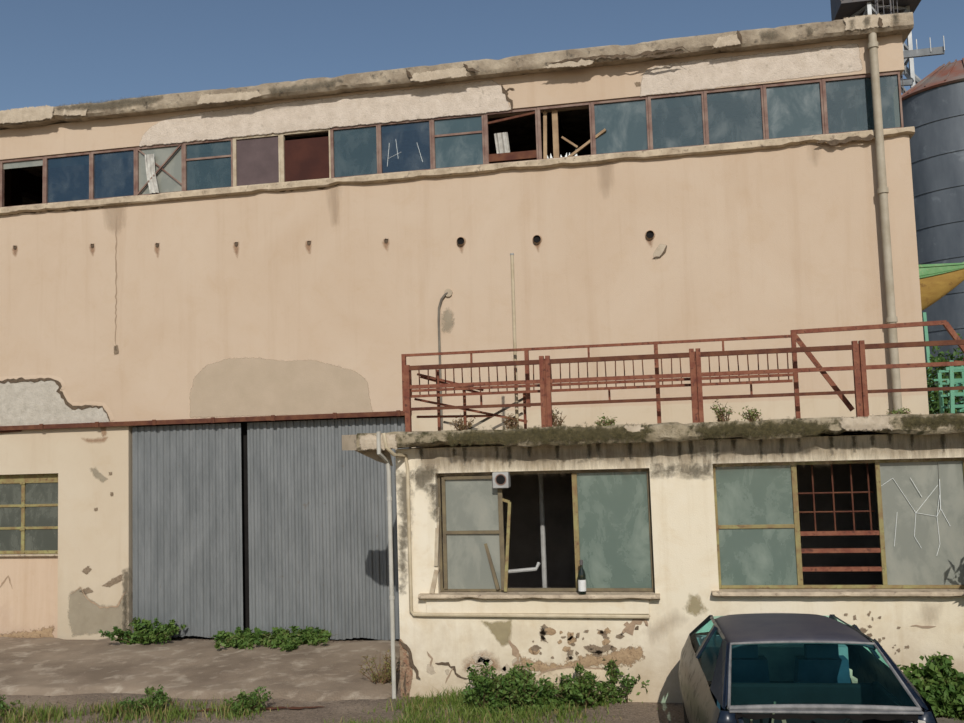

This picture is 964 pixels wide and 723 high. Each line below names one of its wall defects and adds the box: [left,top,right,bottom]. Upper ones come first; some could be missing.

flaking render [0,375,115,426]
water stain [653,441,709,477]
flaking render [68,575,126,635]
spalling [0,626,54,638]
spalling [399,639,449,697]
spalling [466,618,645,676]
peeling [844,611,909,654]